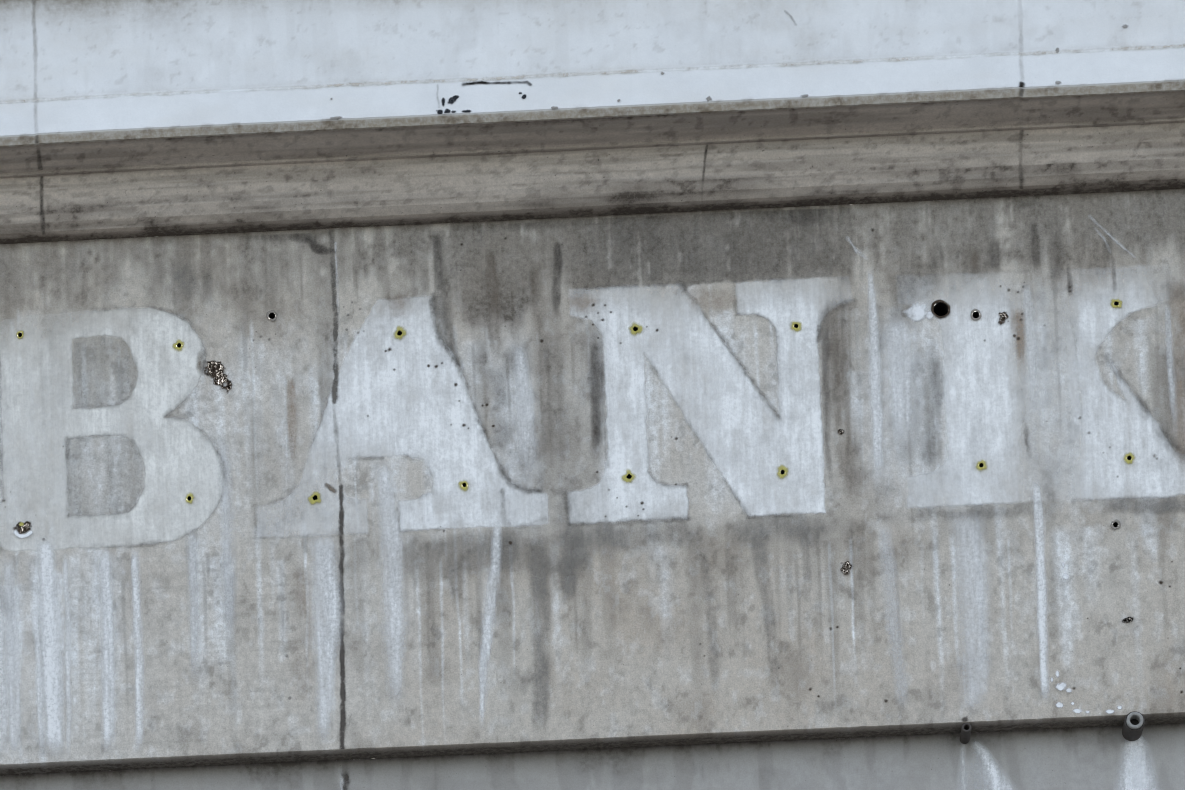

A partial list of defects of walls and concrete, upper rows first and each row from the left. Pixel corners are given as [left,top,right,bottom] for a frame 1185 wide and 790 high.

spalling [204,360,232,392]
crack [307,238,338,403]
damp [516,351,535,463]
damp [869,278,933,463]
damp [32,543,71,747]
damp [100,554,114,744]
damp [131,555,143,740]
damp [315,540,339,731]
crack [339,486,349,790]
damp [379,468,403,688]
damp [480,525,511,717]
damp [1034,486,1048,692]